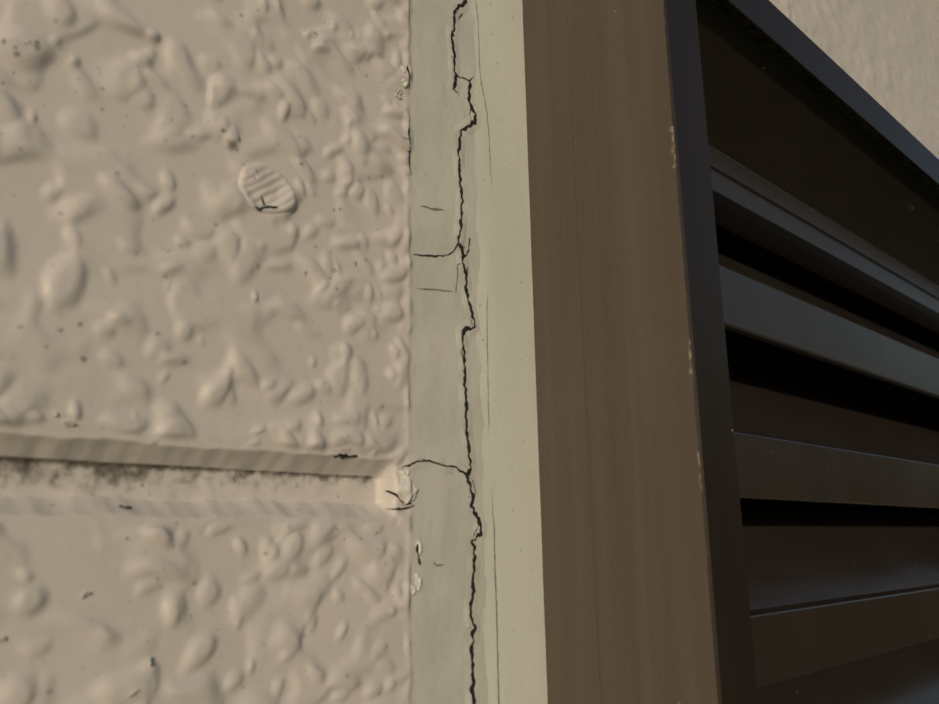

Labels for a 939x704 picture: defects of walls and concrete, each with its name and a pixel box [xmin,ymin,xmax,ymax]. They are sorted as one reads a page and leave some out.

crack [385,0,500,704]
leakage [0,456,219,479]
leakage [240,470,371,481]
crack [334,452,358,460]